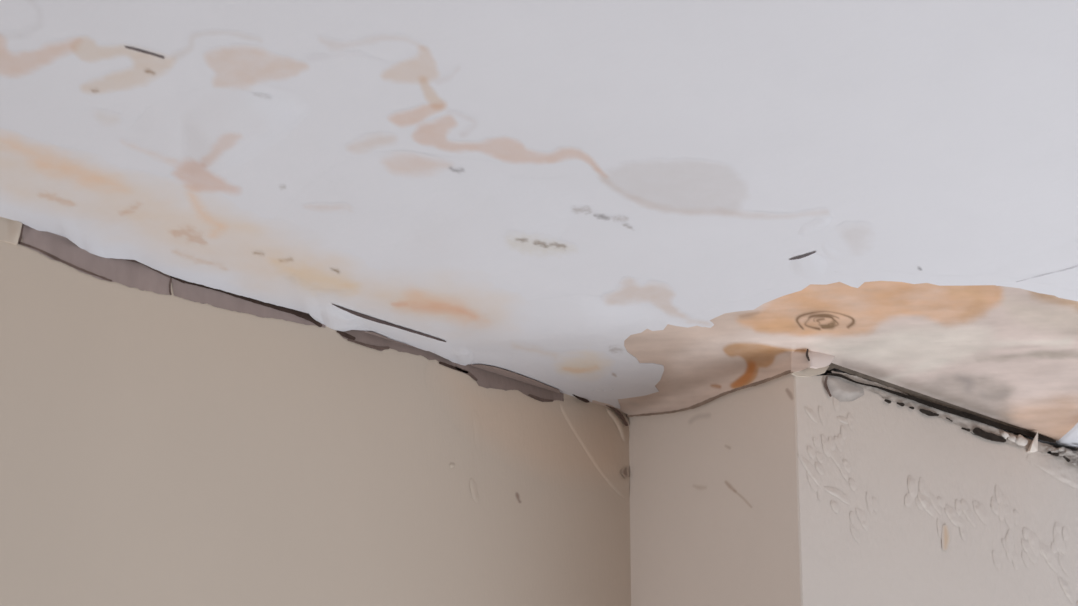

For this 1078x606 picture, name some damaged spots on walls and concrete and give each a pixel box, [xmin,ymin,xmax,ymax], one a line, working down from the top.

water stain [0,0,876,383]
peeling [0,202,1078,466]